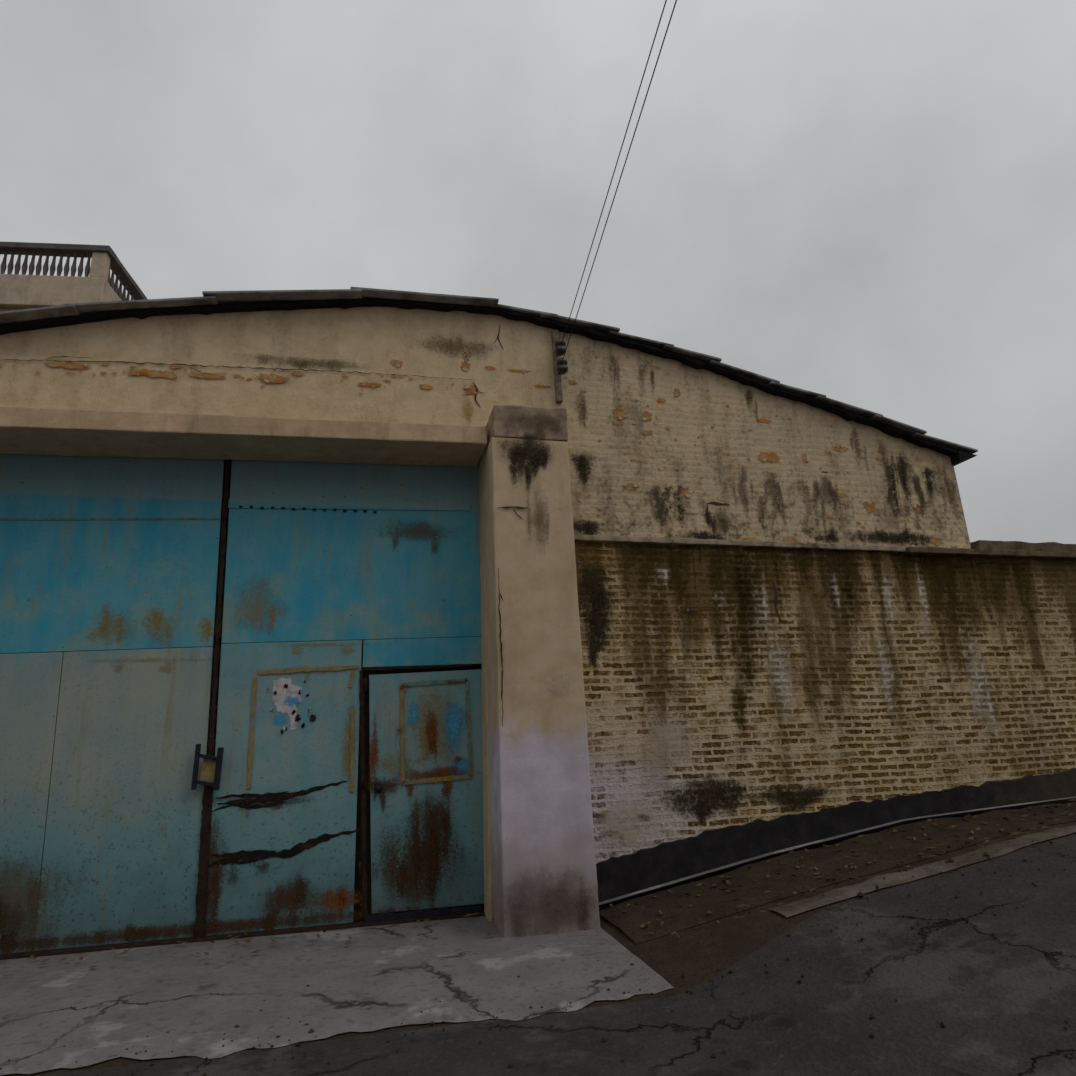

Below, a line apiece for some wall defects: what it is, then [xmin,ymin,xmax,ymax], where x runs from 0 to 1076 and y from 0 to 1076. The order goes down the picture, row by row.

spalling [35,361,304,388]
spalling [341,360,433,395]
spalling [757,452,780,475]
water stain [887,458,933,518]
water stain [588,596,606,670]
water stain [610,512,1037,730]
corrosion [365,714,462,911]
water stain [692,800,710,823]
corrosion [0,823,363,955]